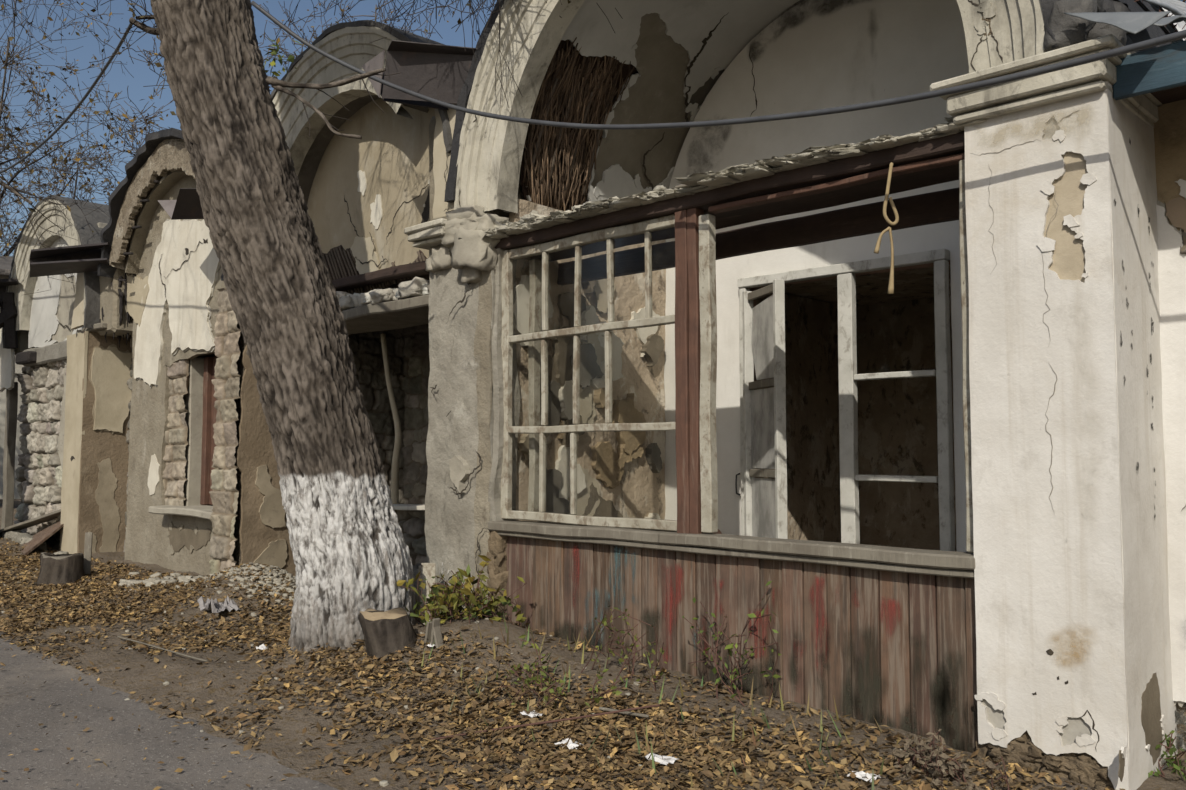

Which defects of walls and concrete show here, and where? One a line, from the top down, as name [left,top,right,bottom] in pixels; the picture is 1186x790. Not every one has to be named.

peeling [88,142,221,434]
peeling [322,170,428,295]
crack [344,152,460,267]
peeling [520,13,725,211]
crack [642,12,729,190]
crack [968,0,1003,72]
peeling [1036,110,1097,282]
crack [1045,364,1057,511]
peeling [1141,99,1186,765]
flaking render [974,692,1127,790]